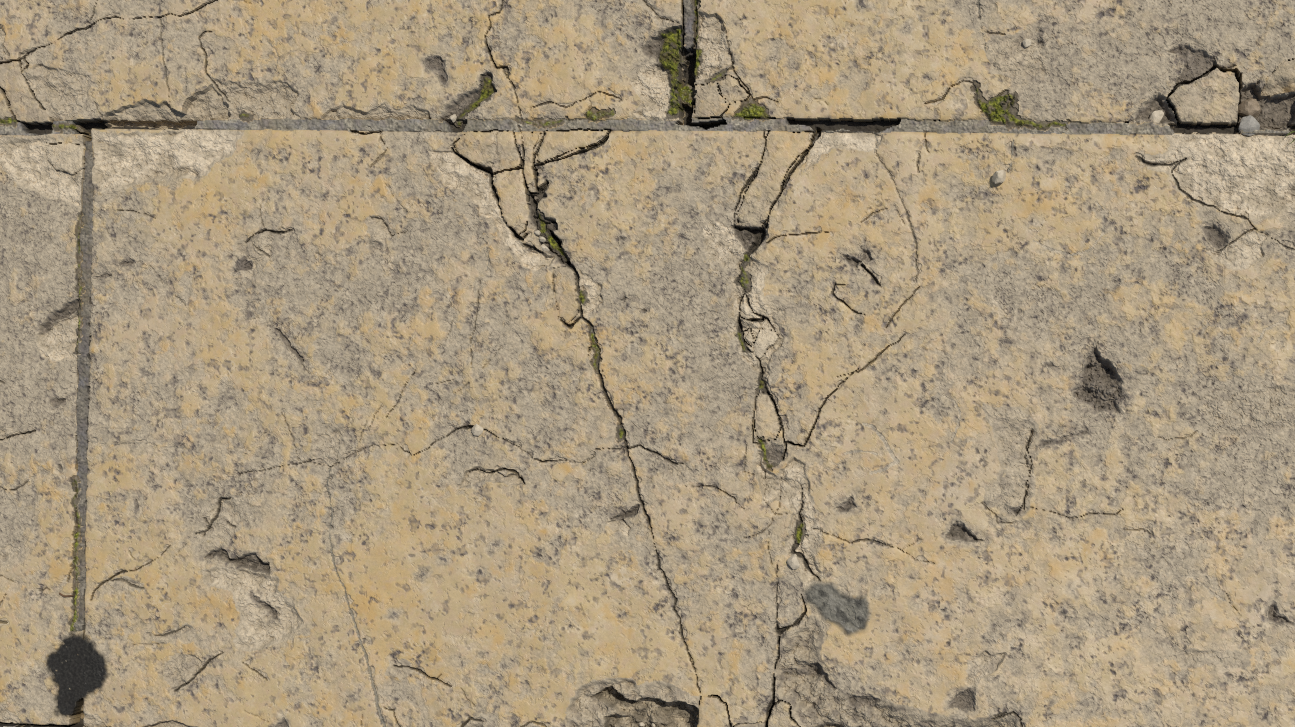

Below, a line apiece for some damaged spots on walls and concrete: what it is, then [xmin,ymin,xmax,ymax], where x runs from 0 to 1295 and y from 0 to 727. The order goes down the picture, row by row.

crack [977,0,1006,53]
spalling [1128,45,1295,271]
crack [0,0,973,727]
leakage [801,579,875,639]
leakage [43,629,113,722]
spalling [566,678,702,727]
spalling [775,616,1021,727]
spalling [1160,643,1253,671]